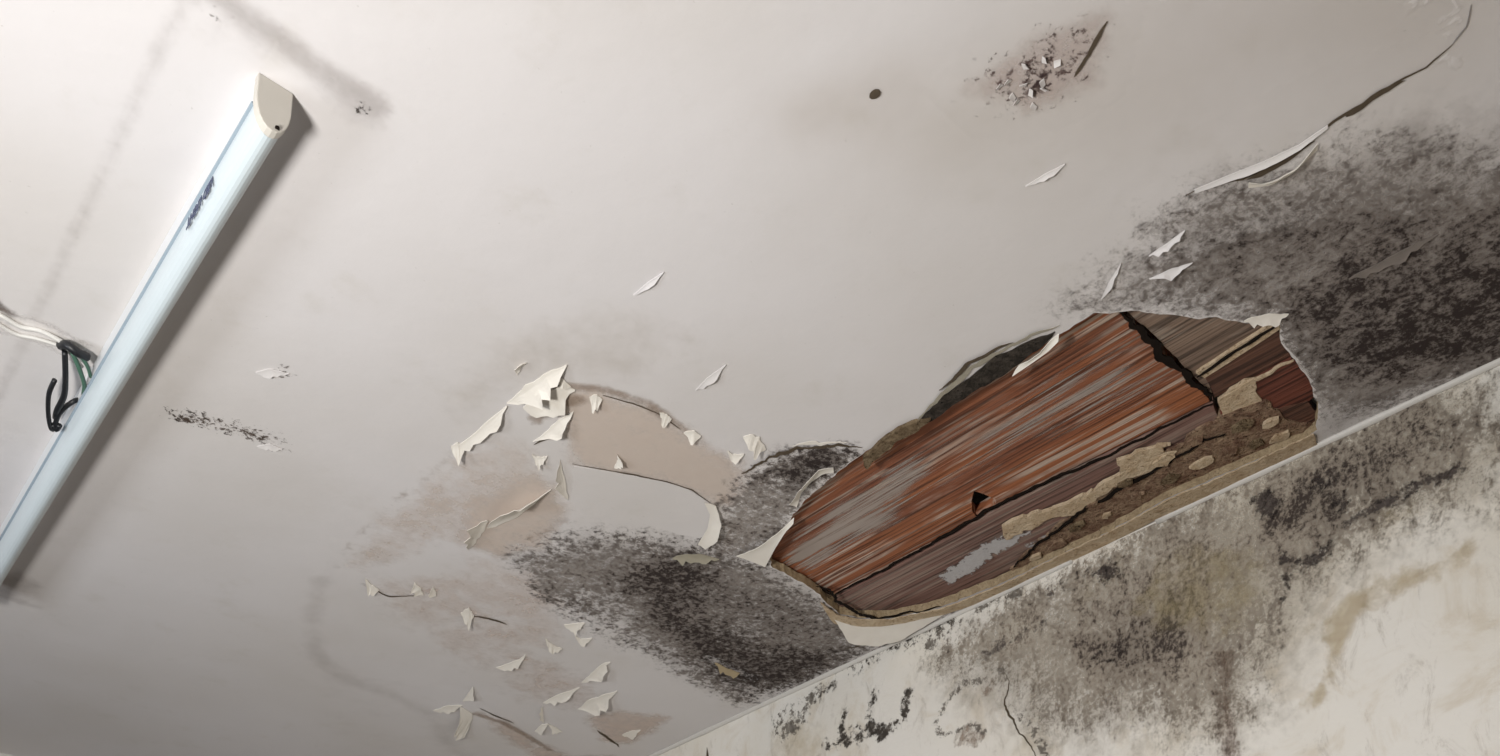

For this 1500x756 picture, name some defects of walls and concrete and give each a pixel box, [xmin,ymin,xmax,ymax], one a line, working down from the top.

crack [1186,6,1471,195]
peeling [430,362,766,555]
flaking render [863,417,931,469]
leakage [506,130,1500,756]
flaking render [1117,436,1214,501]
flaking render [1249,416,1290,450]
flaking render [1030,500,1111,561]
peeling [365,579,436,598]
peeling [461,607,507,631]
peeling [496,654,526,671]
peeling [545,622,592,654]
peeling [433,662,662,756]